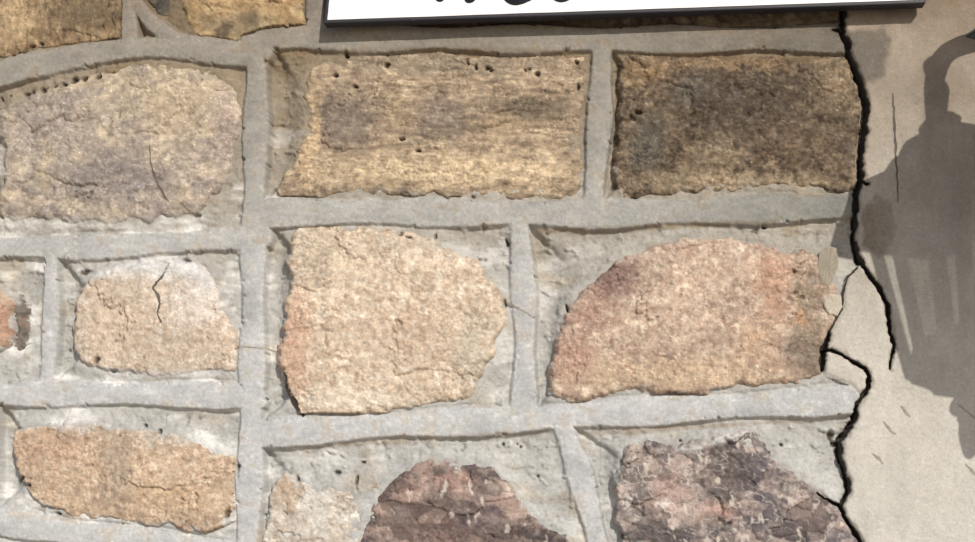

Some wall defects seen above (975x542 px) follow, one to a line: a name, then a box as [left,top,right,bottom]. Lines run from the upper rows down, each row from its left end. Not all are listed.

crack [152,263,169,323]
crack [817,11,895,542]